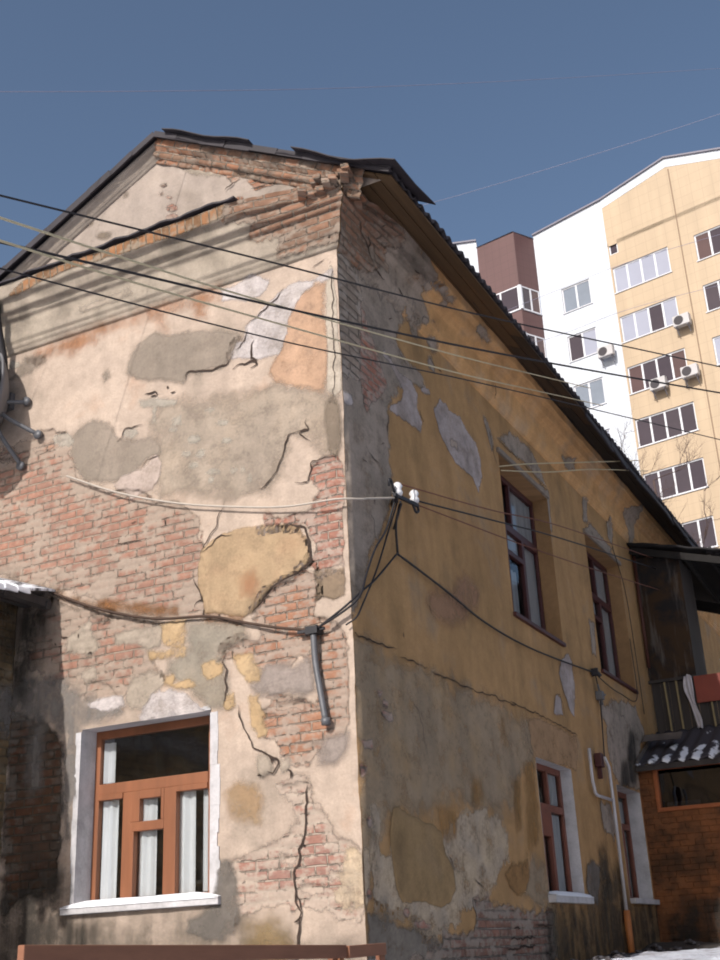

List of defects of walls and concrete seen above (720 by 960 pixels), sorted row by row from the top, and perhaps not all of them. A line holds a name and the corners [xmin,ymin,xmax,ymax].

crack [146,289,283,397]
crack [201,504,229,552]
spalling [0,163,562,960]
crack [252,524,313,613]
crack [355,632,578,755]
peeling [554,654,575,716]
crack [222,654,308,960]
water stain [547,854,720,960]